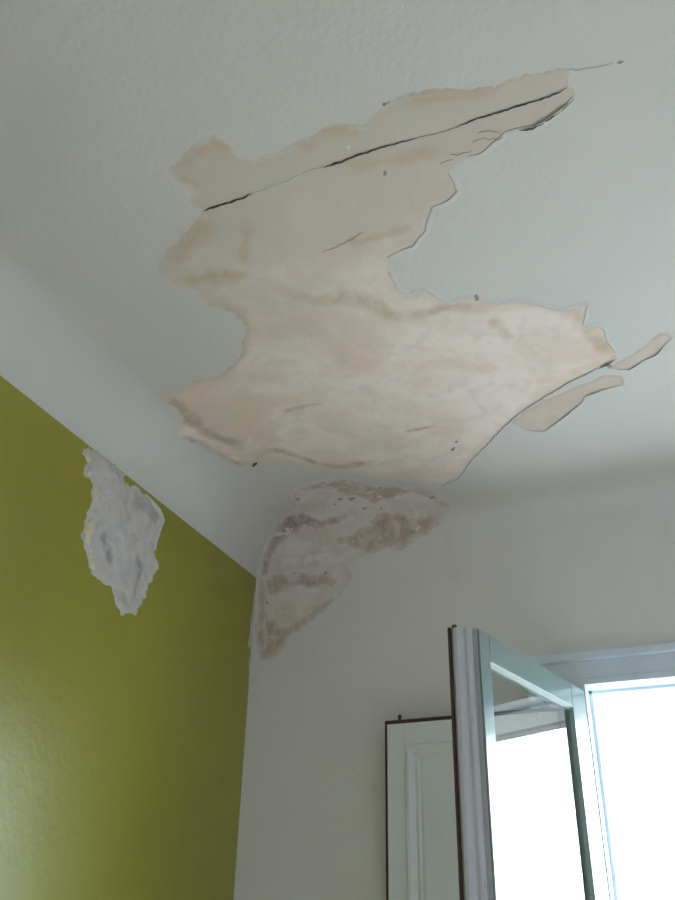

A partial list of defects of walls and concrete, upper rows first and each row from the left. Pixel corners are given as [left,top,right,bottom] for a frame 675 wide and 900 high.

crack [205,63,611,211]
water stain [163,211,521,390]
peeling [157,67,675,484]
peeling [81,447,165,616]
water stain [158,391,453,660]